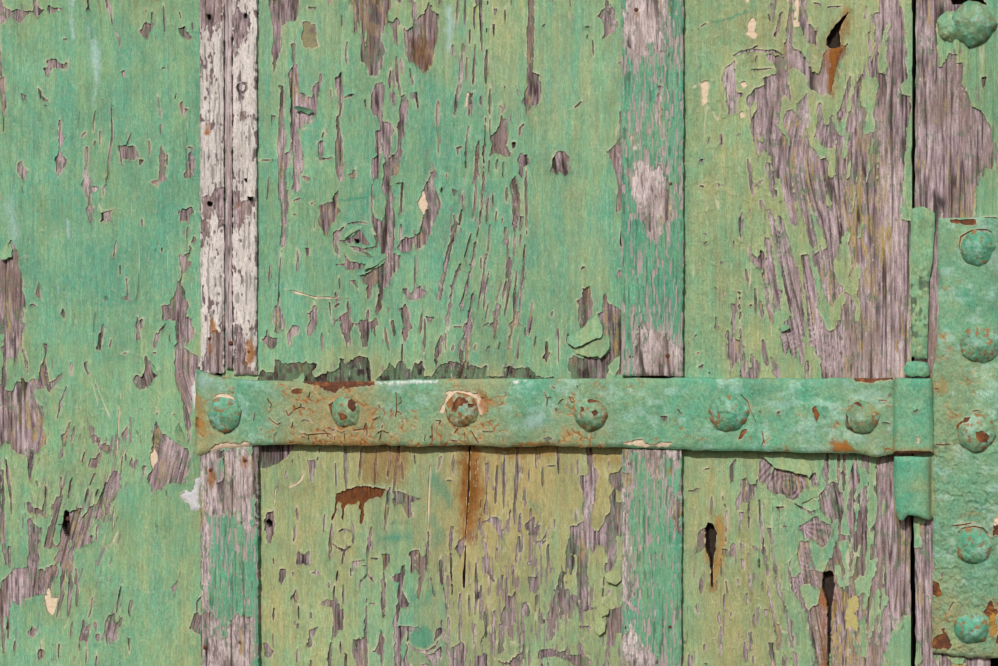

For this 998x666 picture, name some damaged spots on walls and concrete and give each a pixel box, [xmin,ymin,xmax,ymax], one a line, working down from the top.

peeling [0,0,63,134]
rust [829,47,843,91]
peeling [697,0,998,391]
peeling [130,0,683,666]
peeling [0,238,124,657]
rust [292,381,378,425]
rust [332,486,385,524]
crack [253,393,579,666]
rust [460,446,480,536]
crack [696,552,764,664]
peeling [721,436,990,666]
rust [932,625,955,651]